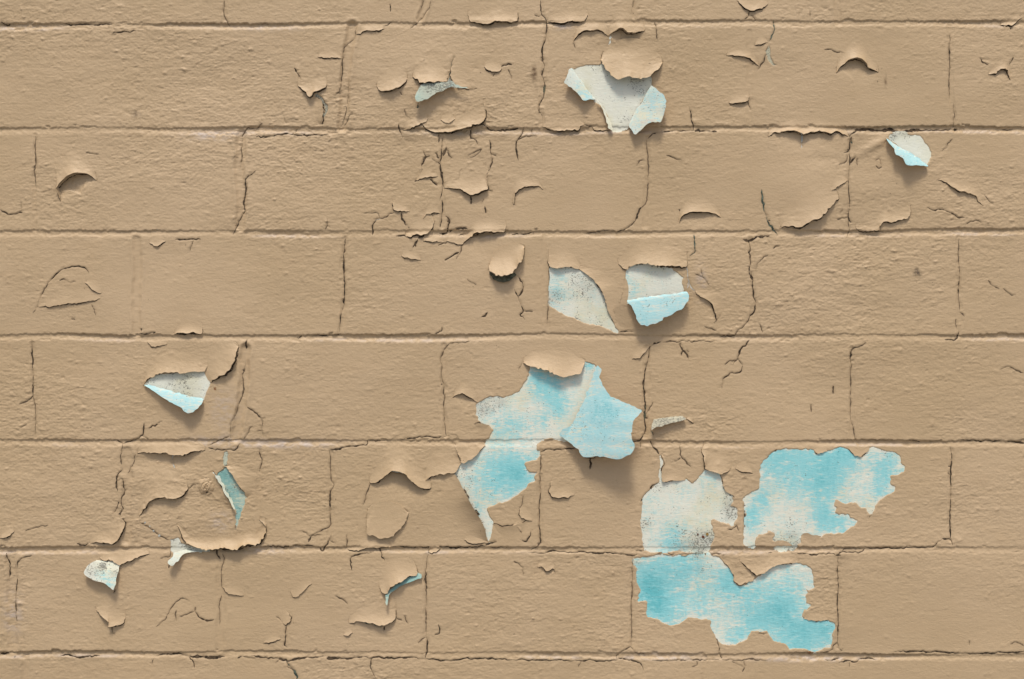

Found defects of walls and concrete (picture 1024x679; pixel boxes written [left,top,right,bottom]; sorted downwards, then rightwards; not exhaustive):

peeling [535,6,666,134]
peeling [372,52,533,318]
crack [397,124,518,251]
peeling [140,322,239,425]
peeling [547,231,728,333]
crack [633,235,777,448]
peeling [77,510,149,632]
crack [115,421,161,509]
peeling [128,436,267,568]
crack [152,448,759,679]
peeling [336,349,642,636]
peeling [633,413,905,653]